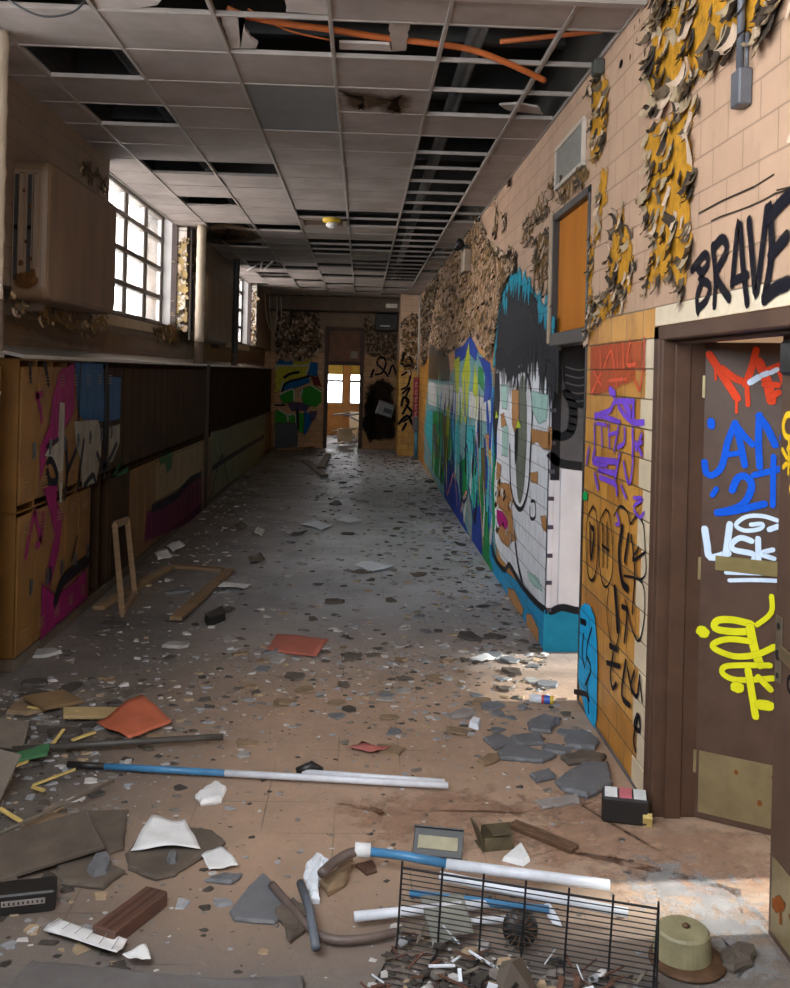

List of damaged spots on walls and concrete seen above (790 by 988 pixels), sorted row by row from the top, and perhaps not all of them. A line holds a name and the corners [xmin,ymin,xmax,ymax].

spalling [285,0,328,15]
spalling [221,17,258,49]
spalling [339,23,410,51]
peeling [79,161,108,194]
peeling [364,0,790,375]